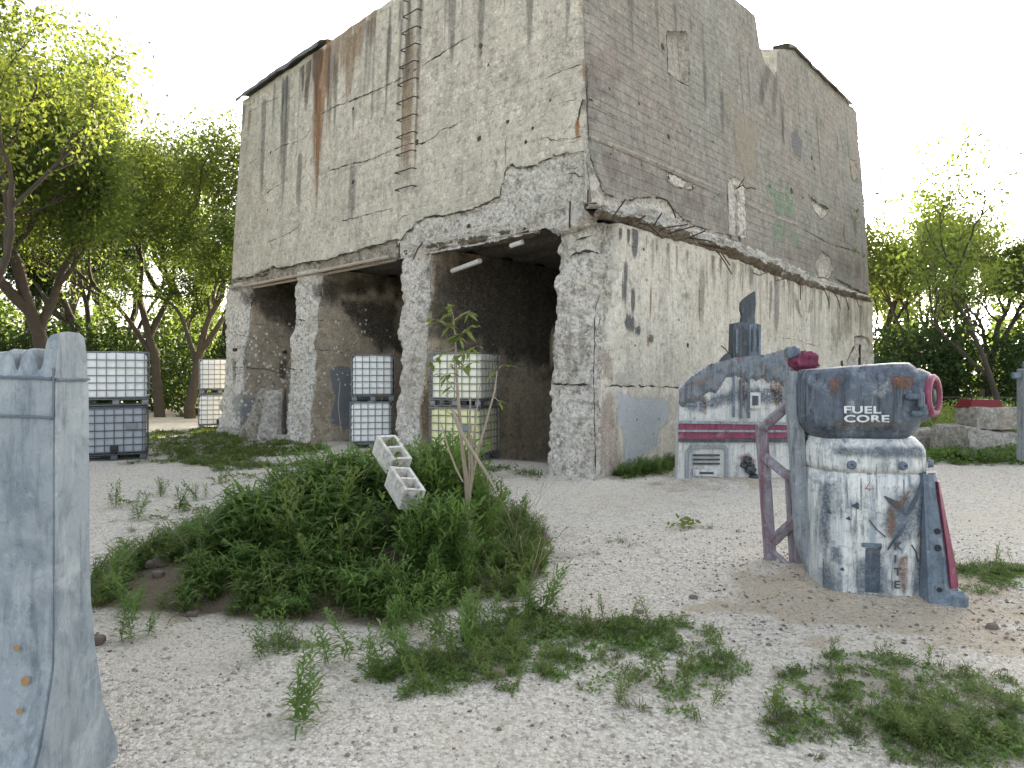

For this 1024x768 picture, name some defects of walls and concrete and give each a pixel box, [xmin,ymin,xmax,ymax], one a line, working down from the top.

rust [301,0,377,185]
leakage [365,1,423,90]
crack [237,64,723,280]
spalling [231,139,741,287]
leakage [607,229,653,341]
spalling [815,252,859,310]